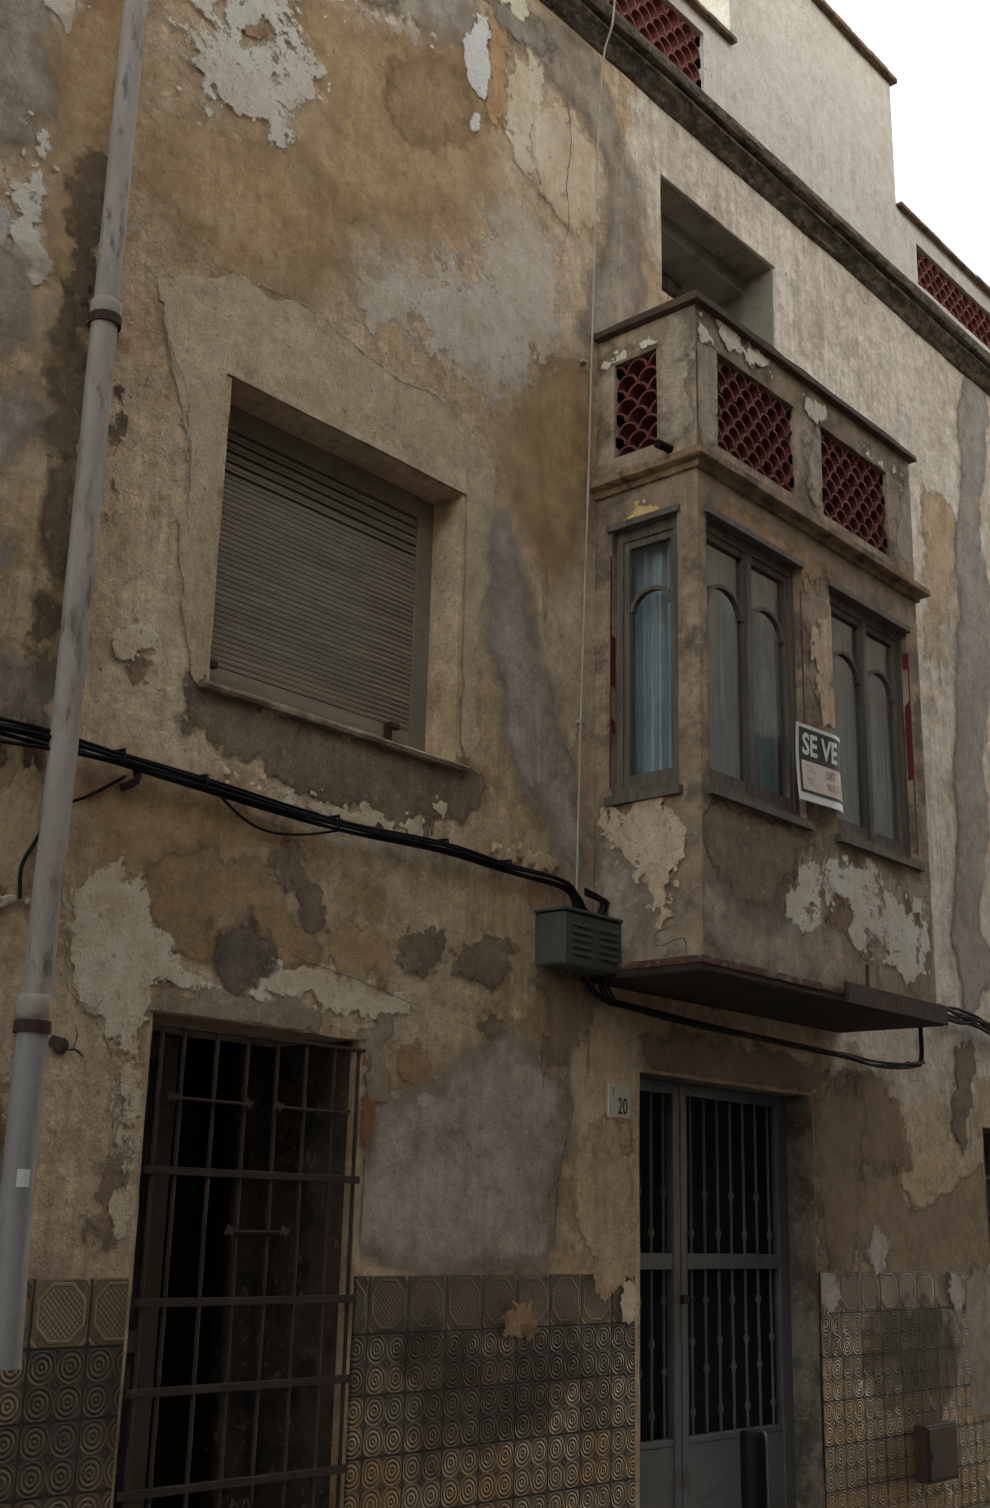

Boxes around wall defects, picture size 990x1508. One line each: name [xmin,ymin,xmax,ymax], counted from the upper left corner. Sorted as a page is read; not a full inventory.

peeling [5,110,62,286]
peeling [44,0,91,35]
peeling [164,0,331,150]
leakage [157,0,557,301]
peeling [463,0,604,239]
leakage [0,0,123,772]
leakage [175,671,487,837]
peeling [593,797,688,929]
peeling [783,853,931,986]
peeling [61,844,416,1240]
spalling [821,1273,841,1316]